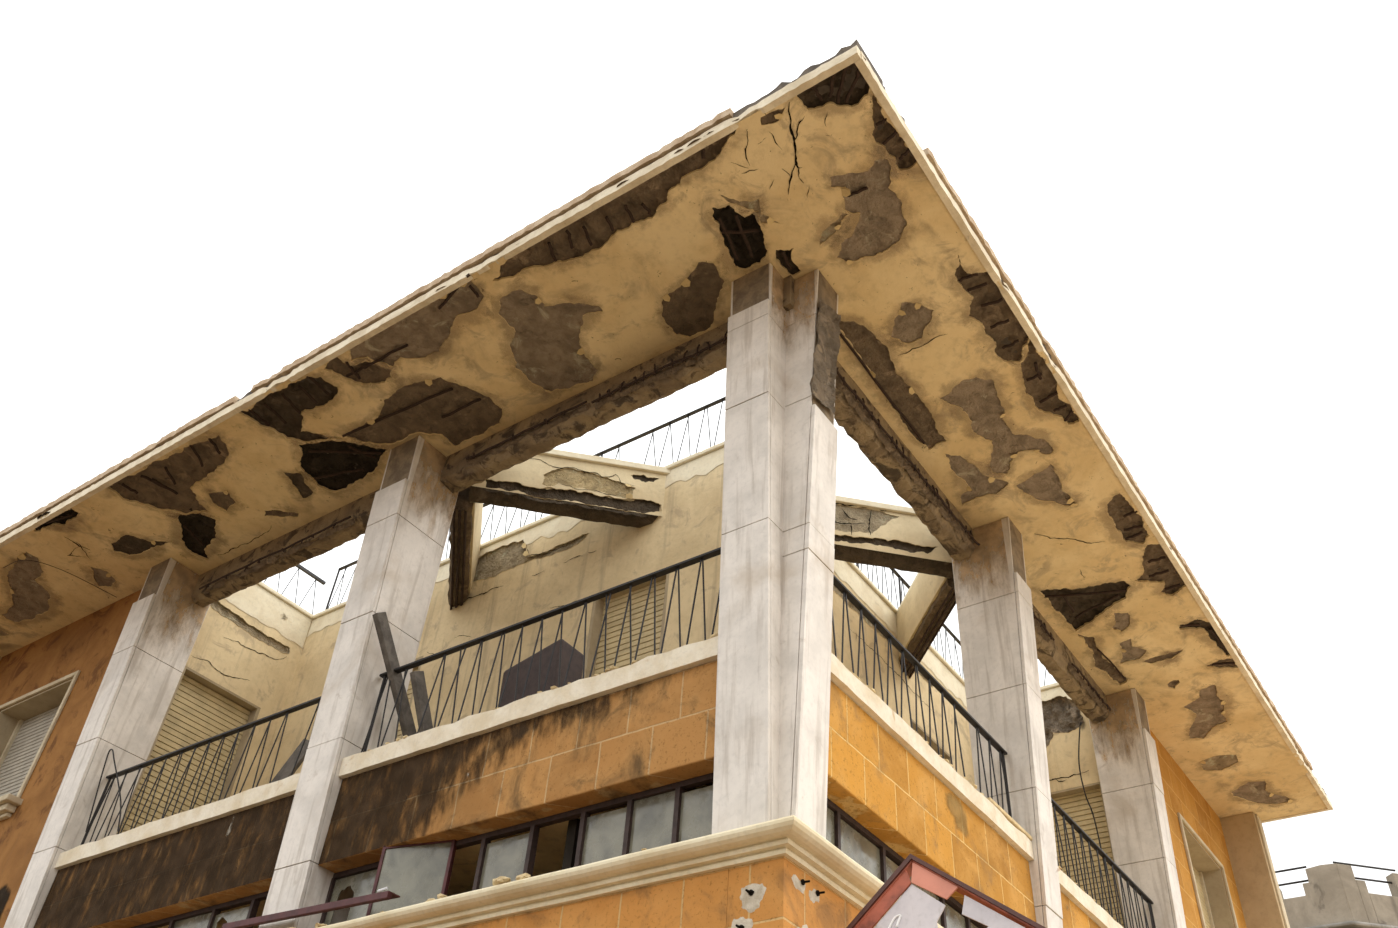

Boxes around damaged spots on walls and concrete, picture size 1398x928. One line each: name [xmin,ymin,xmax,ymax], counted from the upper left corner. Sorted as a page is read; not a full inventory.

crack [735,102,828,194]
flaking render [797,56,917,265]
spalling [712,195,800,275]
flaking render [241,118,739,517]
spalling [955,255,1079,423]
flaking render [810,299,1078,554]
spalling [109,435,235,558]
spalling [199,516,355,654]
flaking render [473,534,587,582]
spalling [1040,493,1185,748]
flaking render [1184,685,1226,738]
spalling [1179,619,1238,668]